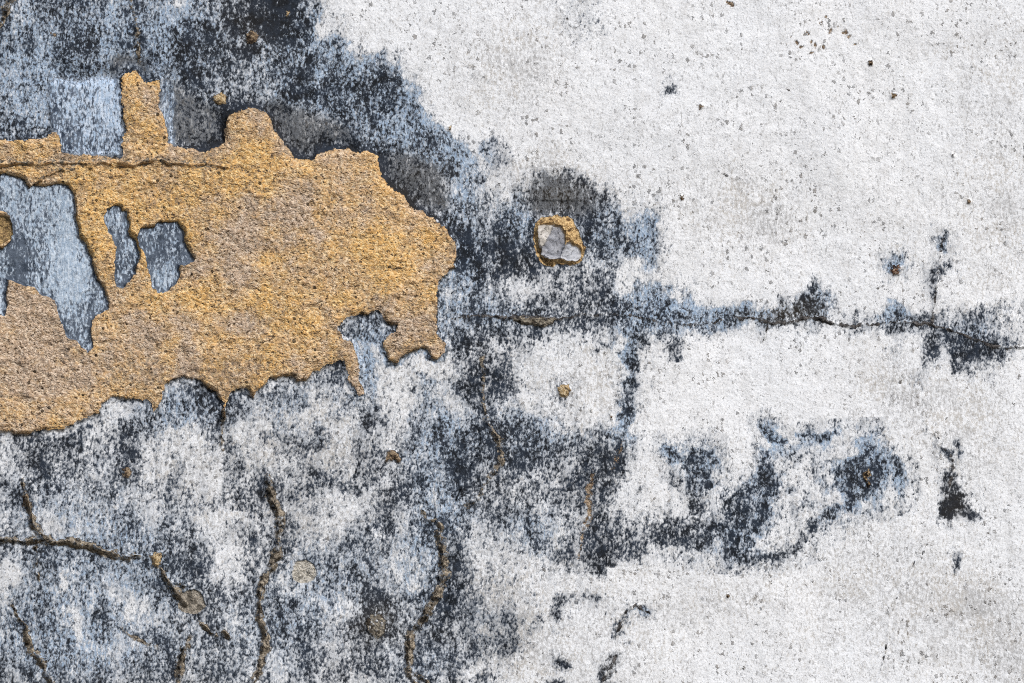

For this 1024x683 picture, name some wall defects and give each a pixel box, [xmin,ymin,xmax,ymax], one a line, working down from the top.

leakage [0,0,516,230]
spalling [0,70,456,434]
spalling [533,214,587,267]
crack [451,236,1024,351]
leakage [839,297,1024,390]
leakage [923,225,953,300]
crack [0,478,186,601]
crack [251,473,287,683]
crack [404,509,451,683]
leakage [0,167,921,683]
leakage [923,429,984,528]